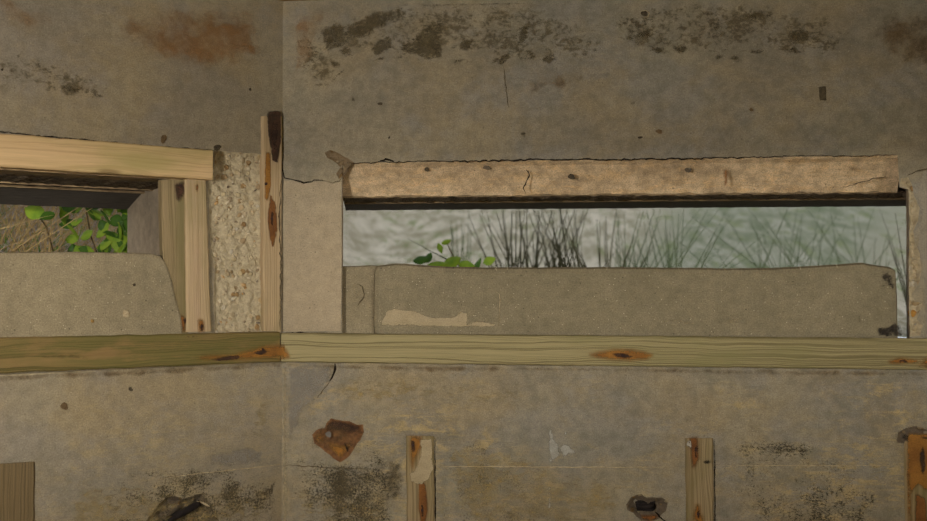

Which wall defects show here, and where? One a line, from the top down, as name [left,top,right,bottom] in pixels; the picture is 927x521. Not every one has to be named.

peeling [307,8,596,77]
crack [278,154,896,325]
spalling [147,493,219,521]
mould [295,457,401,521]
hole [626,494,668,521]